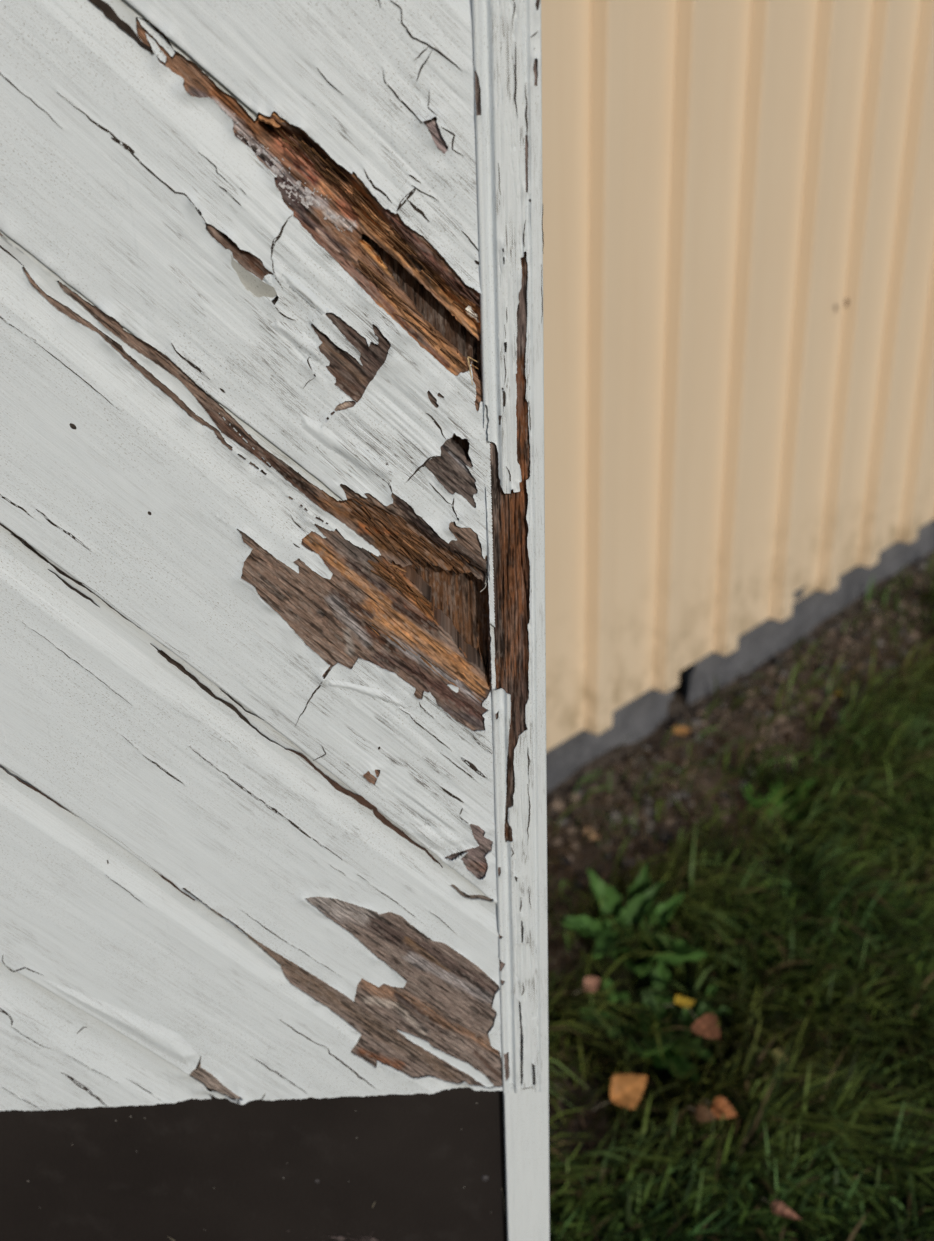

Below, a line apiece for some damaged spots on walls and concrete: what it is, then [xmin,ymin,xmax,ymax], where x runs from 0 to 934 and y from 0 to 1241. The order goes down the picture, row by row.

peeling [198,209,277,298]
crack [364,169,438,222]
crack [378,0,462,155]
peeling [423,117,448,154]
spalling [22,267,499,731]
peeling [184,888,535,1088]